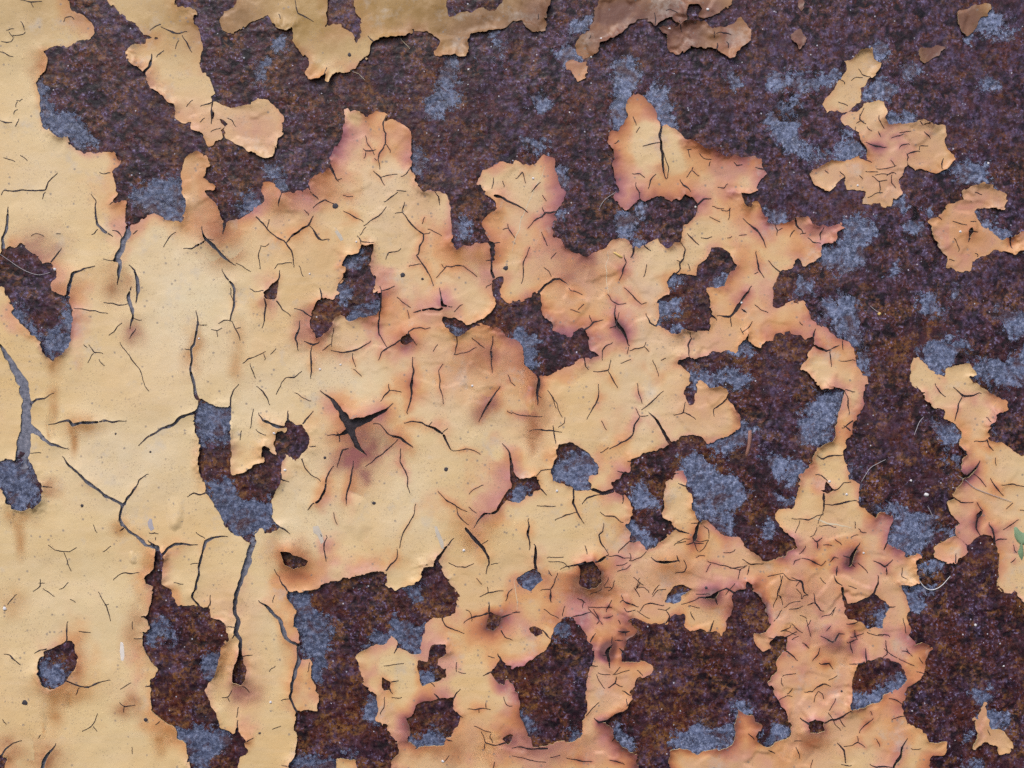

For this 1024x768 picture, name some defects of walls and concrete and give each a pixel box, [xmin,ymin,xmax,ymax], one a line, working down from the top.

crack [1,172,149,391]
rust [203,221,225,240]
crack [825,69,944,198]
crack [0,344,310,743]
peeling [191,393,310,547]
crack [138,115,925,768]
peeling [609,331,844,562]
crack [935,383,1024,563]
peeling [141,551,248,768]
peeling [287,556,460,768]
peeling [491,617,595,748]
peeling [606,582,792,768]